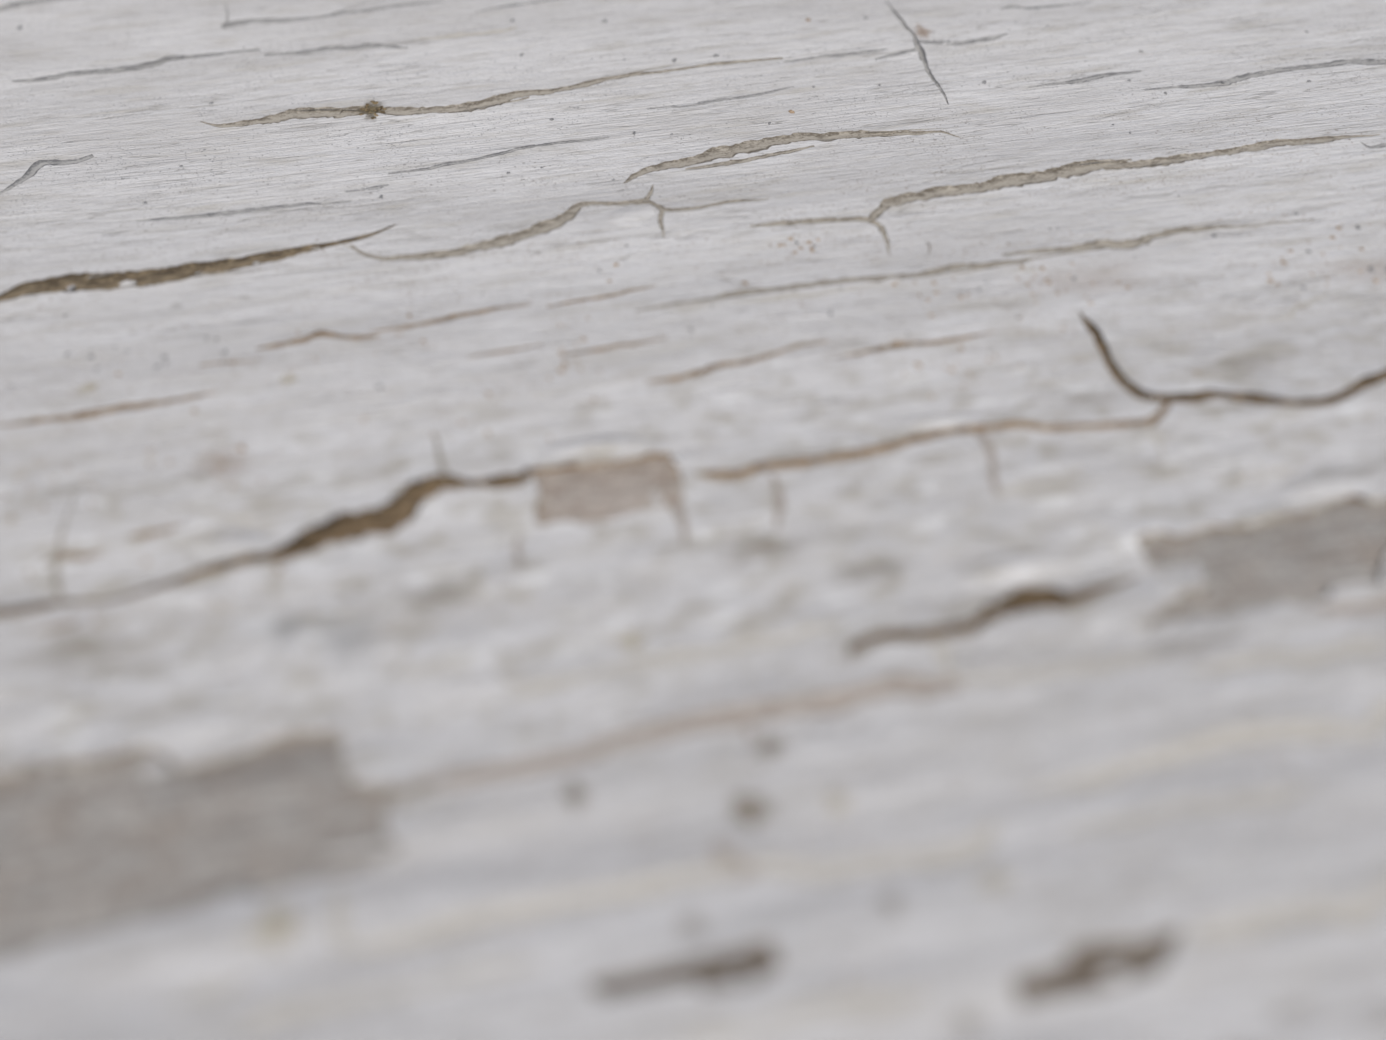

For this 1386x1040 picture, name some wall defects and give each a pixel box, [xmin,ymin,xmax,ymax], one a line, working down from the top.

crack [0,0,1386,427]
crack [0,433,530,617]
peeling [528,452,683,526]
crack [670,503,689,549]
crack [695,311,1386,530]
peeling [1136,495,1386,628]
peeling [0,729,429,958]